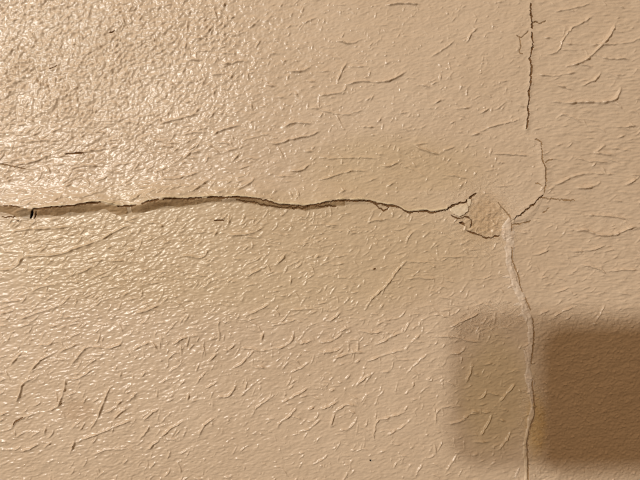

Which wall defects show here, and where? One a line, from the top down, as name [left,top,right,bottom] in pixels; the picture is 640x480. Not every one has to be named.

crack [498,3,575,225]
crack [2,192,500,239]
peeling [450,199,471,217]